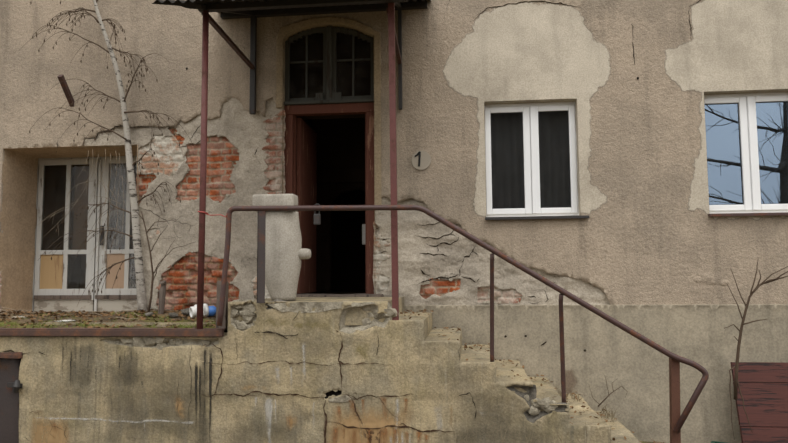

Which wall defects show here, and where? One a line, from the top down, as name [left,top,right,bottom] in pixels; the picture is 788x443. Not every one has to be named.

peeling [77,95,610,334]
crack [417,222,479,285]
crack [254,311,300,339]
damp [188,350,212,433]
crack [177,331,455,443]
rust [333,398,428,443]
spalling [505,385,570,423]